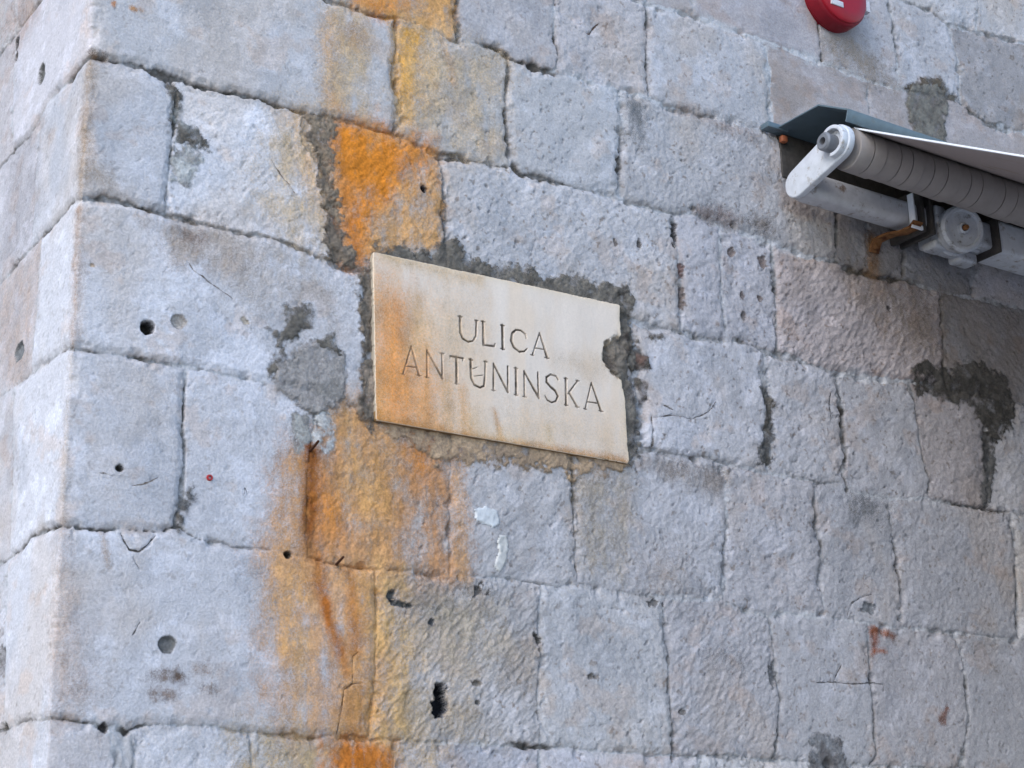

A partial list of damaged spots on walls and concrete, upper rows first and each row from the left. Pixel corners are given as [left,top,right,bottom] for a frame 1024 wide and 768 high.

rust [205,0,629,768]
peeling [474,505,509,572]
crack [336,652,363,734]